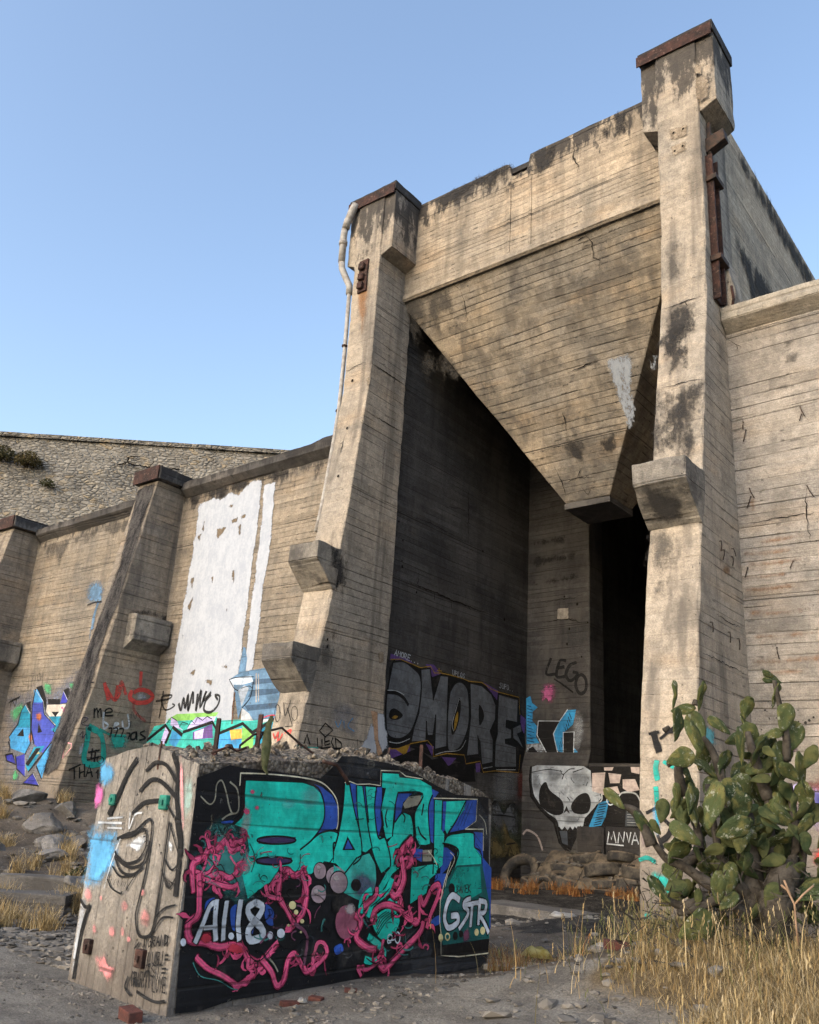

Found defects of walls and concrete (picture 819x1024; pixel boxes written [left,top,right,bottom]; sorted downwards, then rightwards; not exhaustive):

leakage [602,112,626,135]
leakage [439,164,513,205]
leakage [534,146,555,172]
leakage [659,304,694,370]
leakage [607,353,635,428]
crack [747,488,811,543]
peeling [165,480,275,726]